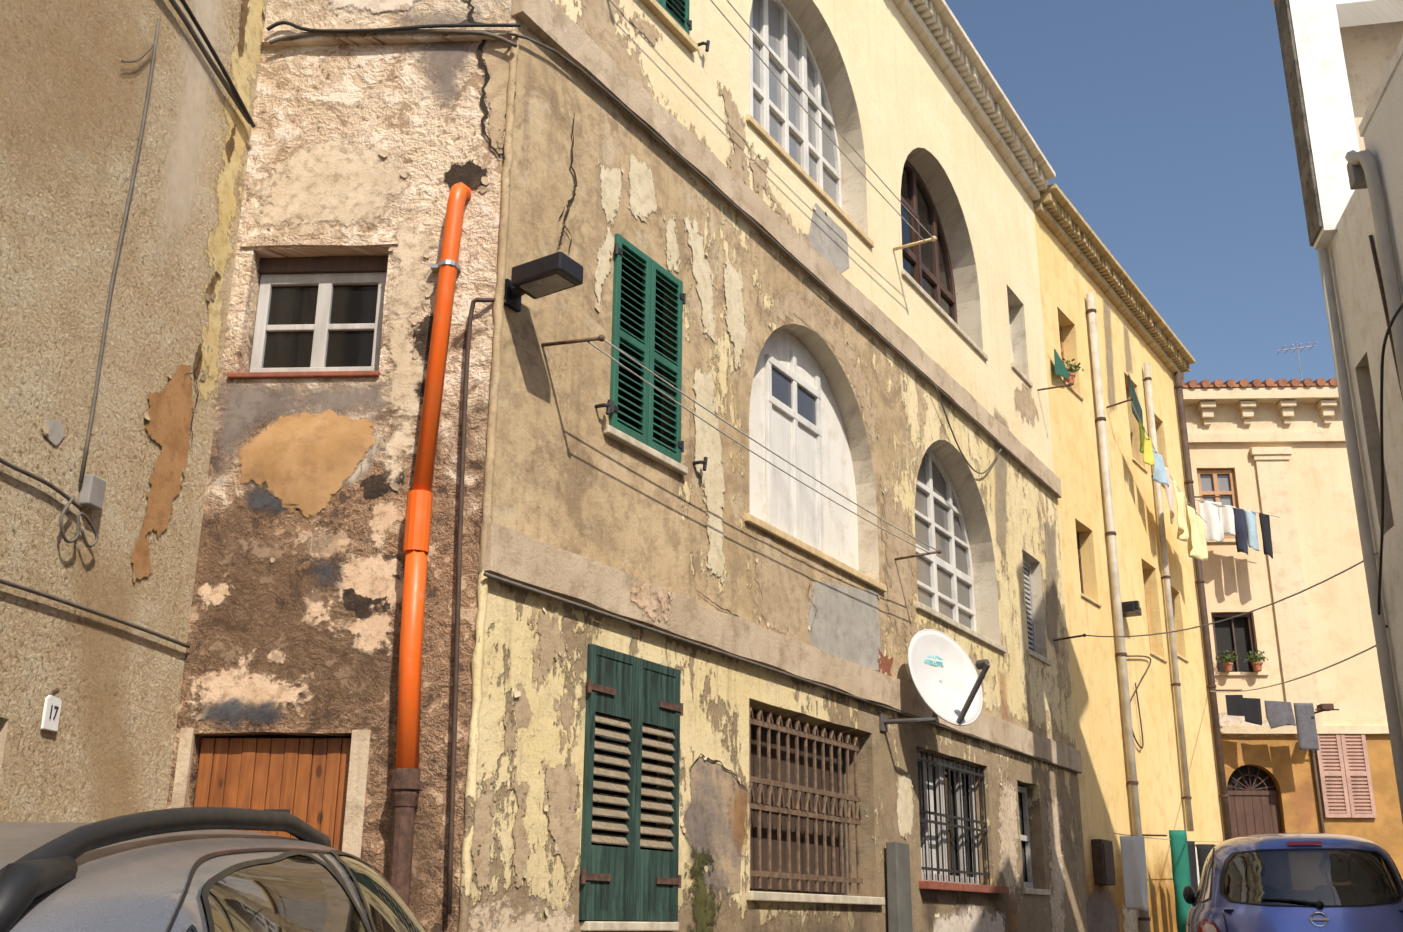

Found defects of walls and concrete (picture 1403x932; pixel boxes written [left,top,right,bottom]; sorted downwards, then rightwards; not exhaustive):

spalling [444,160,489,193]
crack [457,0,516,171]
flaking render [474,39,519,154]
crack [558,113,577,254]
peeling [552,0,816,251]
flaking render [131,0,438,662]
damp [219,380,386,465]
damp [348,435,380,481]
flaking render [185,648,314,721]
peeling [468,602,582,932]
flaking render [932,767,1022,932]
flaking render [1046,789,1066,932]